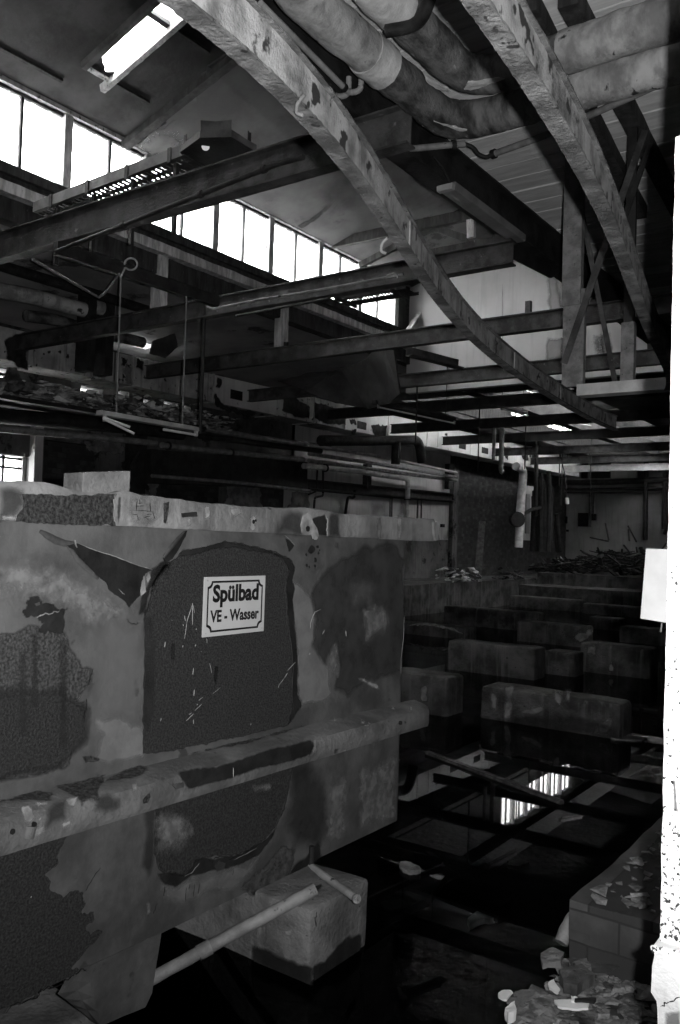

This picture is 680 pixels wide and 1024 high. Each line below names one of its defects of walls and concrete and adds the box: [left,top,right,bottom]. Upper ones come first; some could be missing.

peeling [0,625,93,780]
peeling [142,536,301,754]
water stain [312,502,463,695]
peeling [0,803,102,1009]
peeling [154,768,292,886]